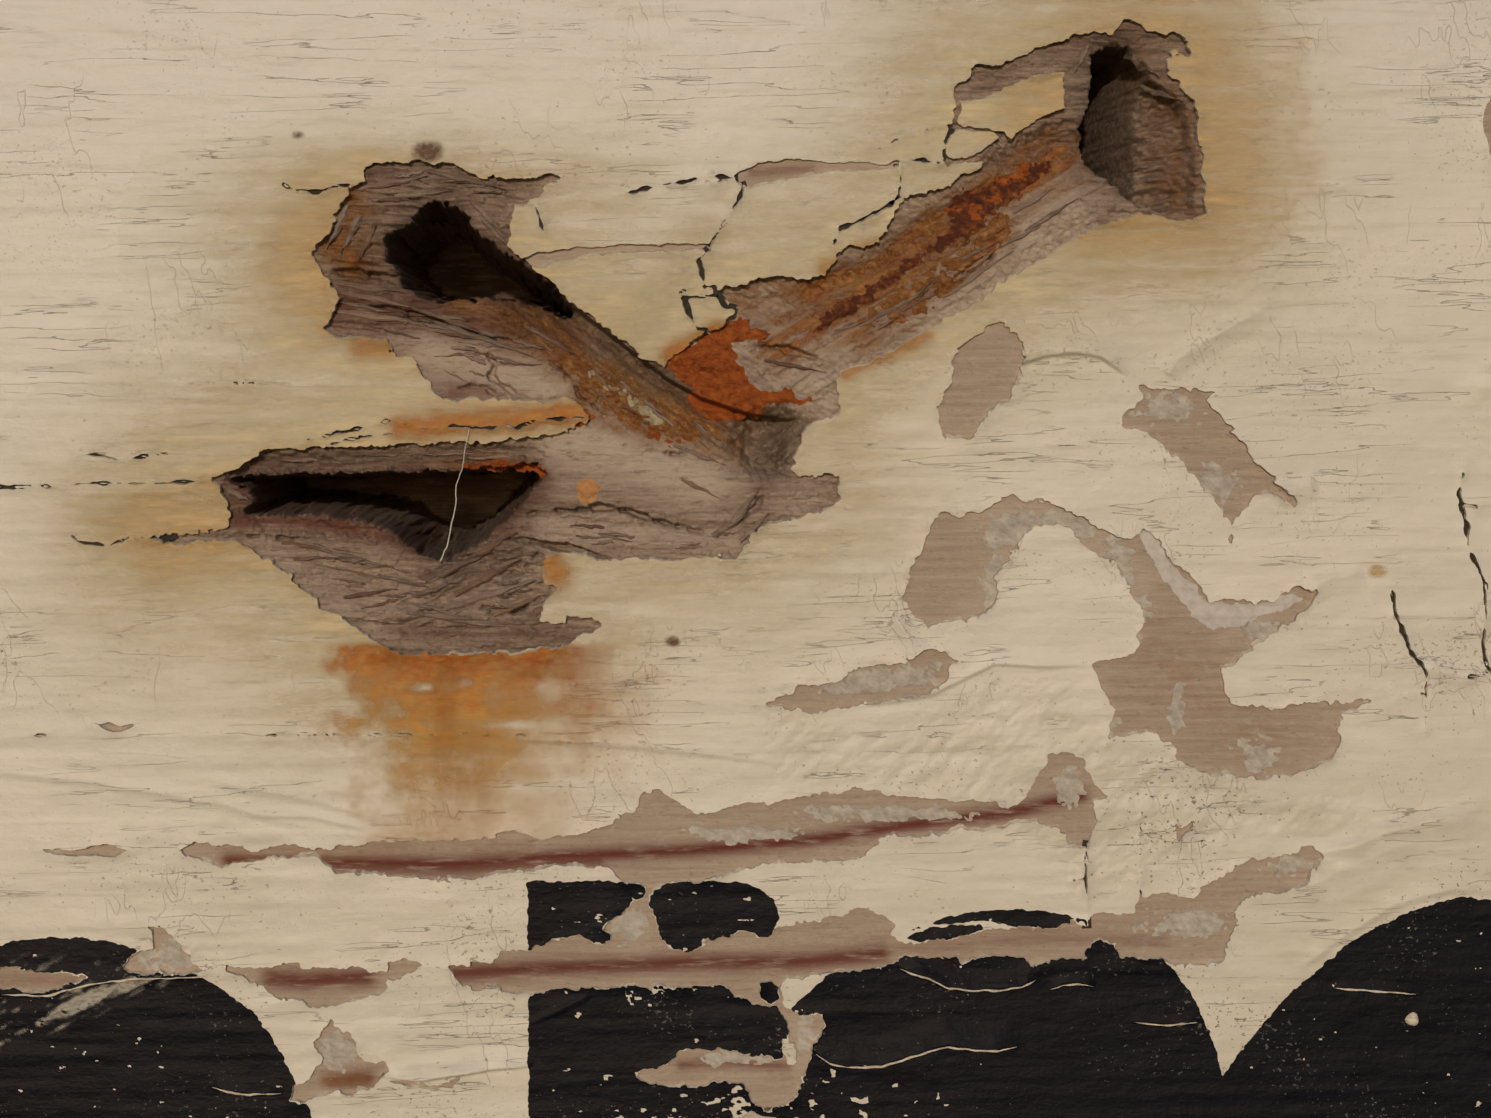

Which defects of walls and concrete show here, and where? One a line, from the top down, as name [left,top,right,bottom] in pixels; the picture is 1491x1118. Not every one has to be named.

crack [629,173,747,334]
rust [393,76,1076,449]
crack [833,124,955,243]
rust [1081,13,1263,251]
peeling [522,426,840,560]
peeling [1122,385,1295,542]
rust [329,645,577,788]
peeling [902,494,1370,779]
crack [1390,591,1427,696]
crack [1456,474,1491,678]
peeling [0,927,205,1028]
peeling [182,752,1321,1118]